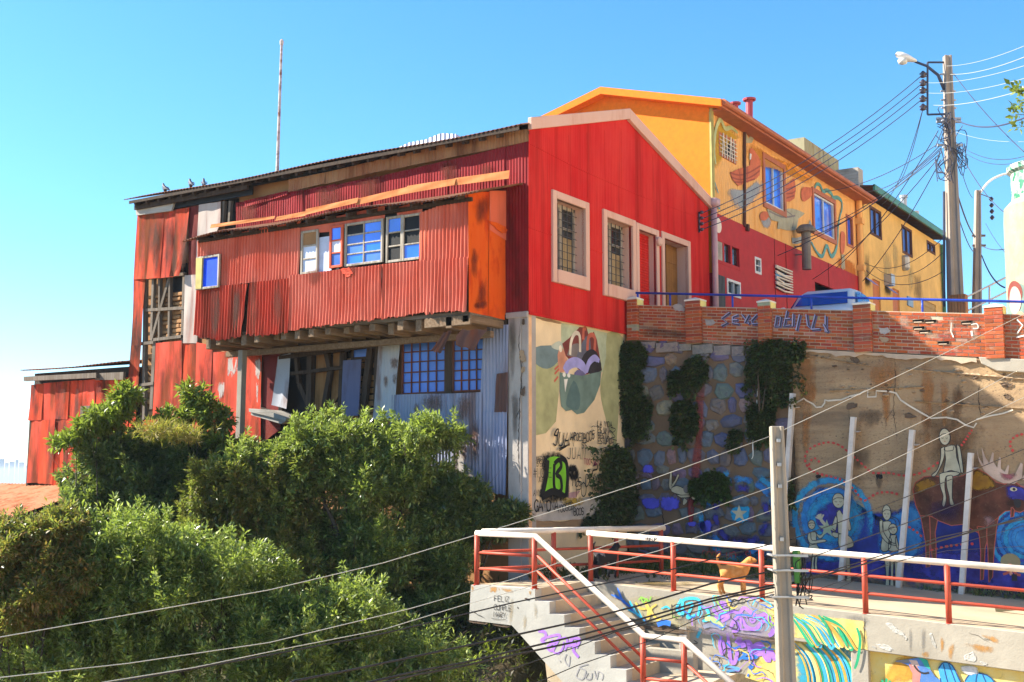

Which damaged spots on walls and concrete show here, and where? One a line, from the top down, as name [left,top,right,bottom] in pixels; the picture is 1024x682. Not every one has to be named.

water stain [928,391,969,464]